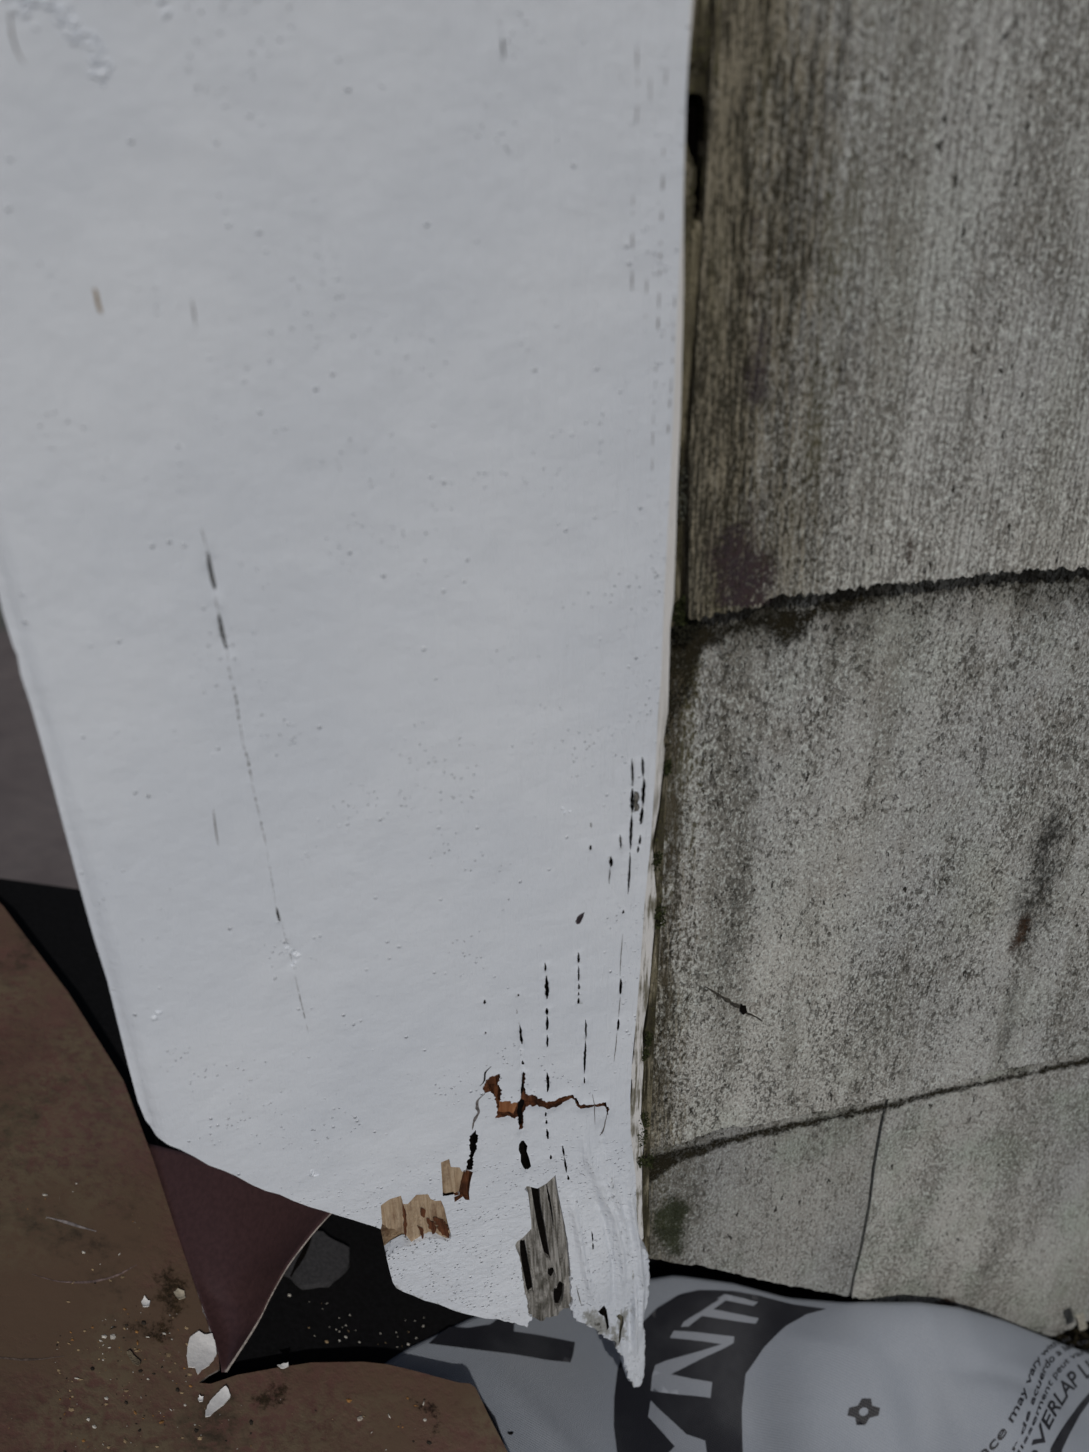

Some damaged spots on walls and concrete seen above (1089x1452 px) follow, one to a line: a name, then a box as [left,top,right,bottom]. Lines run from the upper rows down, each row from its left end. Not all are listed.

crack [590,757,646,892]
damp [1015,812,1066,956]
crack [472,936,623,1249]
spalling [598,1306,624,1343]